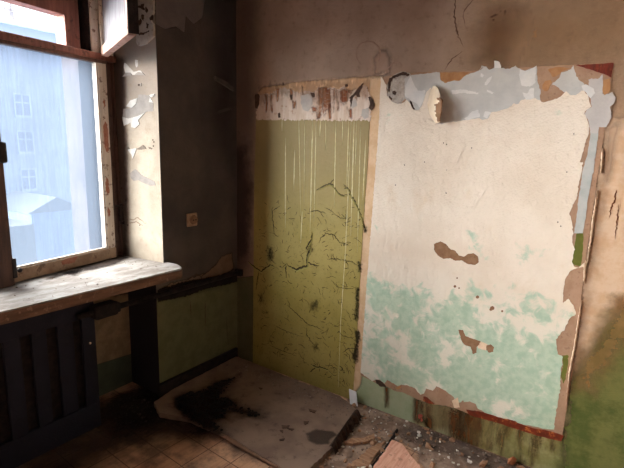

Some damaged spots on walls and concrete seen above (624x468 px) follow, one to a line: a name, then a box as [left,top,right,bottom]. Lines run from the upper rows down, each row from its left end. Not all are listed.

crack [447,0,473,66]
peeling [122,60,145,77]
peeling [122,94,155,128]
damp [294,119,326,235]
damp [334,120,367,248]
peeling [255,61,616,391]
crack [609,190,619,236]
crack [248,179,366,386]
damp [352,331,360,364]
peeling [375,379,464,411]
corrosion [414,399,481,447]